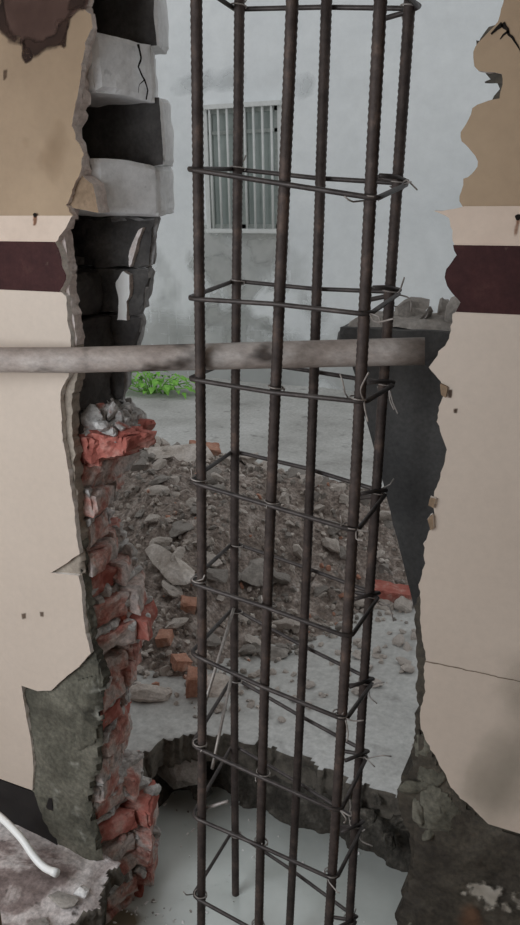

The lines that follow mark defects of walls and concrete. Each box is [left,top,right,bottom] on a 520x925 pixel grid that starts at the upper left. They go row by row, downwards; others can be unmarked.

crack [491,22,520,50]
crack [137,44,148,100]
flaking render [440,383,452,398]
spalling [55,549,86,574]
crack [425,661,520,682]
spalling [25,658,107,861]
spalling [399,731,520,925]
damp [462,884,520,912]